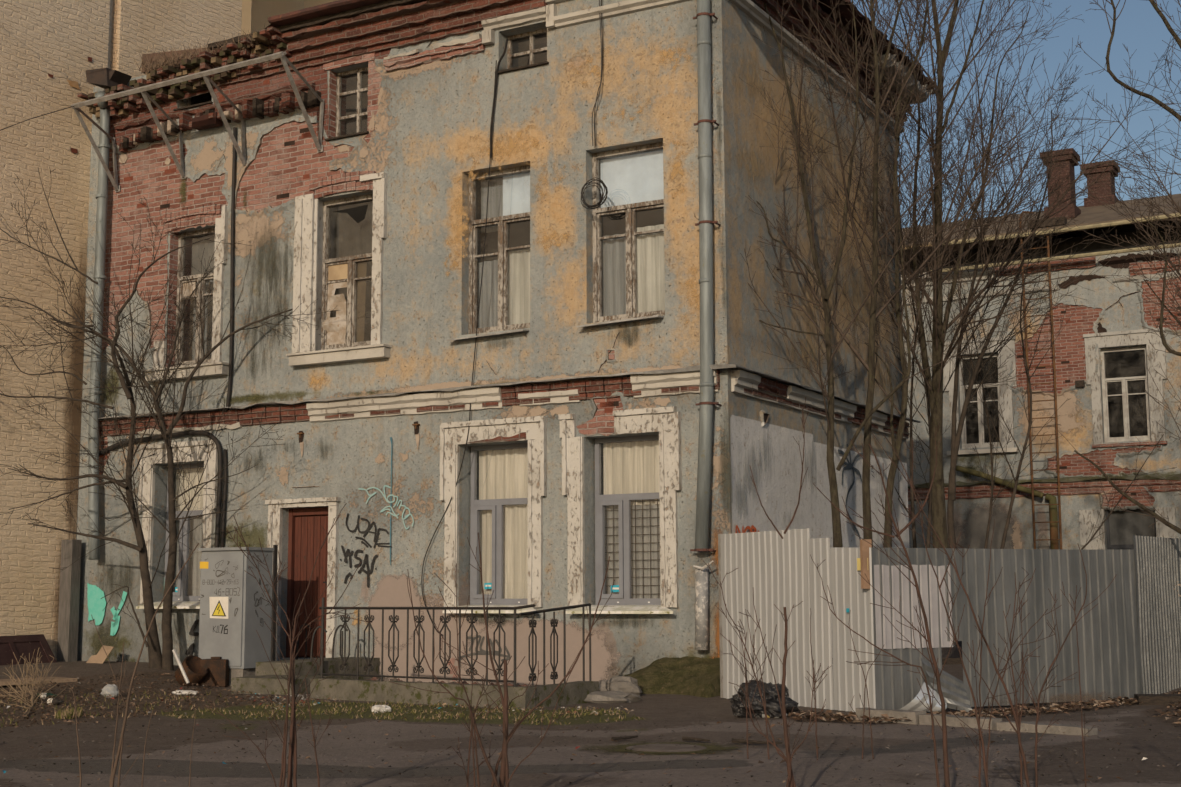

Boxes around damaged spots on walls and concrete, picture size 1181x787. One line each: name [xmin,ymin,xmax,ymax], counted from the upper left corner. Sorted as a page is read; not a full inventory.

flaking render [102,64,384,359]
water stain [257,238,276,284]
flaking render [1009,252,1181,434]
water stain [230,394,261,403]
peeling [387,380,488,393]
peeling [512,373,597,386]
flaking render [576,347,683,436]
flaking render [1043,444,1164,511]